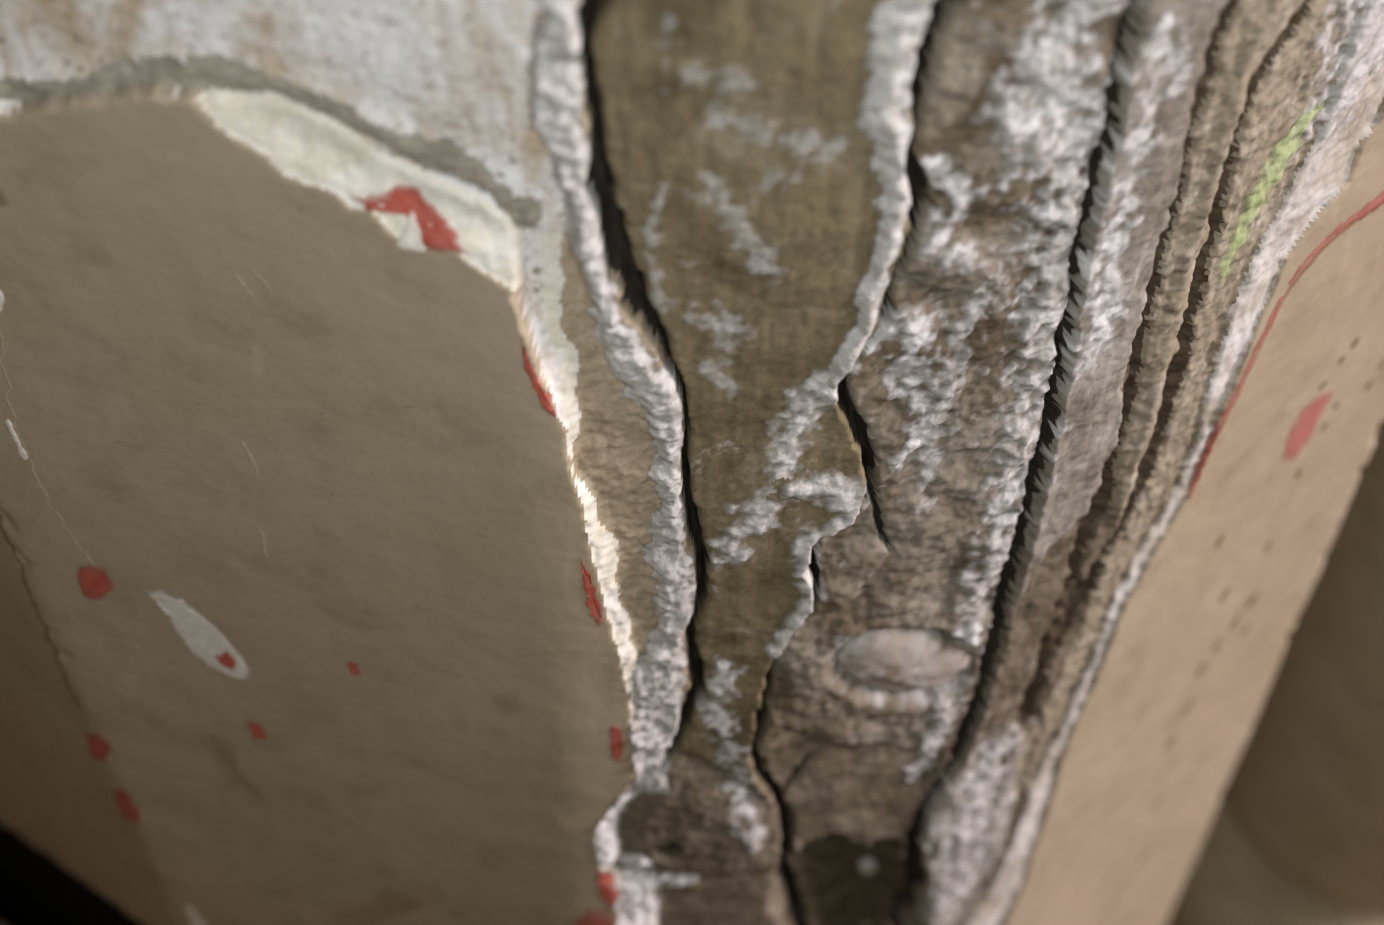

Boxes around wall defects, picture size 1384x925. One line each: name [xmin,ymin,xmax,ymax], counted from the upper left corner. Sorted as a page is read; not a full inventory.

spalling [0,0,662,770]
crack [578,0,709,769]
crack [750,636,831,925]
crack [808,541,820,604]
crack [837,375,892,547]
crack [865,0,954,348]
spalling [575,0,1384,925]
crack [889,0,1312,925]